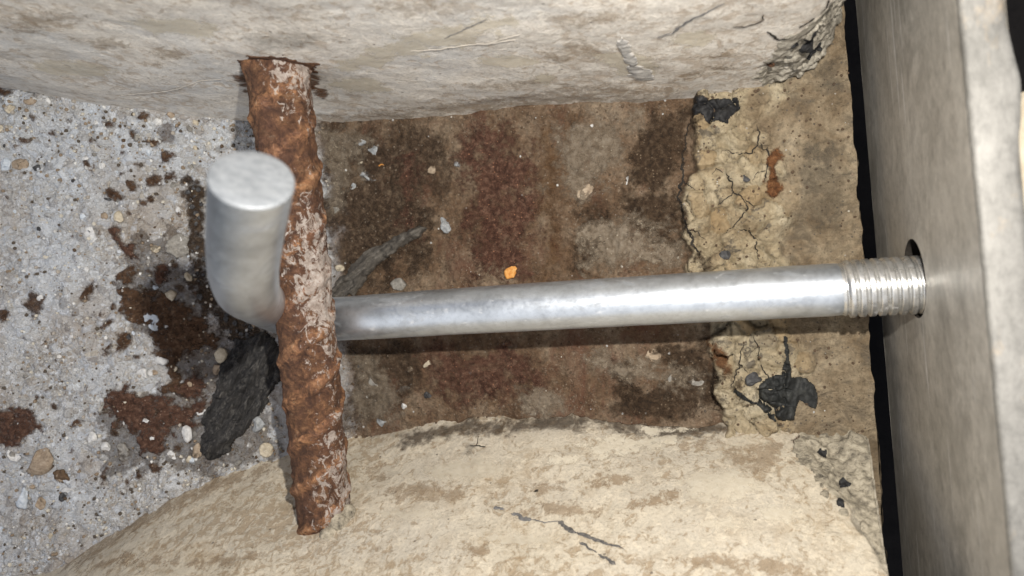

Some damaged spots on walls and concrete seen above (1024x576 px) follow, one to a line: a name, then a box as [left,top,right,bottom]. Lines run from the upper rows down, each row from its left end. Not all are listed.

spalling [752,0,843,87]
corrosion [233,55,328,99]
crack [676,118,770,260]
corrosion [762,146,785,198]
spalling [504,265,517,280]
corrosion [93,225,221,485]
spalling [645,349,661,364]
crack [729,336,769,389]
corrosion [0,390,47,448]
crack [494,506,622,565]